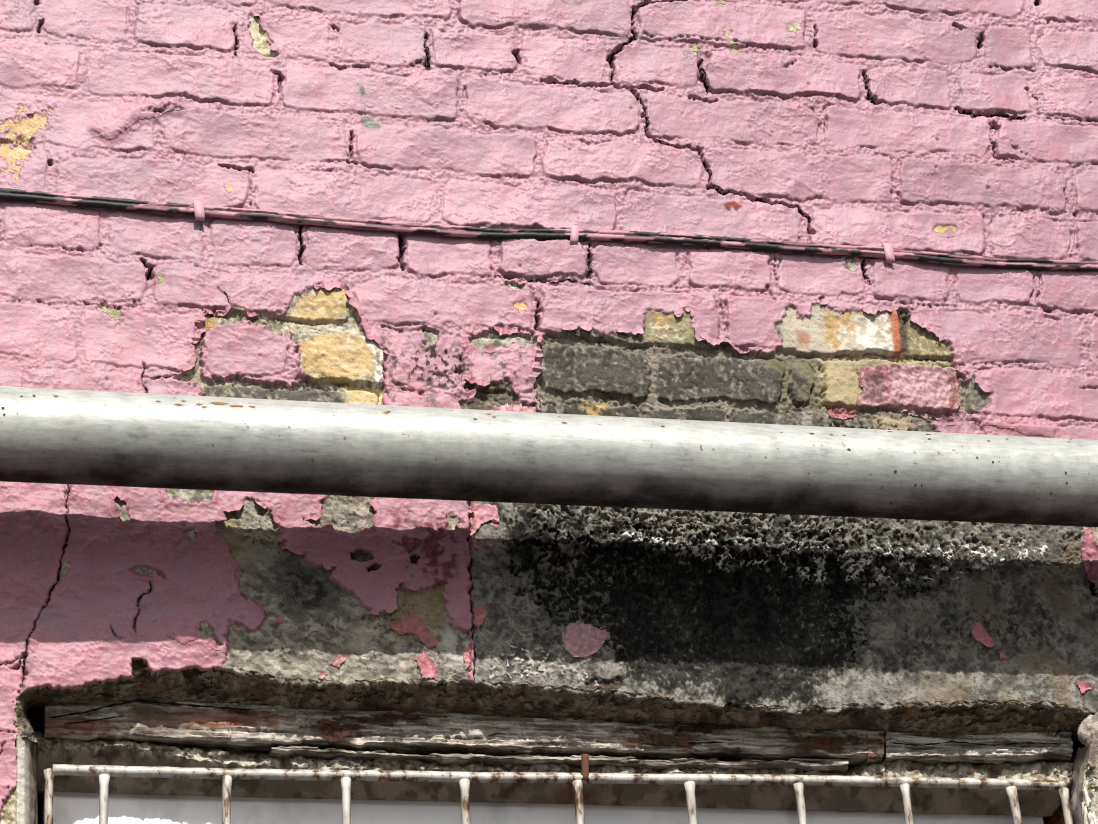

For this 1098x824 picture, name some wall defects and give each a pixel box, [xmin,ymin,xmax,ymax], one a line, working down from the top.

peeling [0,104,55,181]
crack [551,0,811,229]
peeling [174,281,389,405]
peeling [460,298,993,432]
peeling [167,489,213,502]
crack [1,486,71,690]
spalling [12,492,1095,743]
leakage [488,502,1053,714]
peeling [1080,527,1098,605]
corrosion [262,710,452,742]
corrosion [607,720,756,751]
corrosion [782,727,874,753]